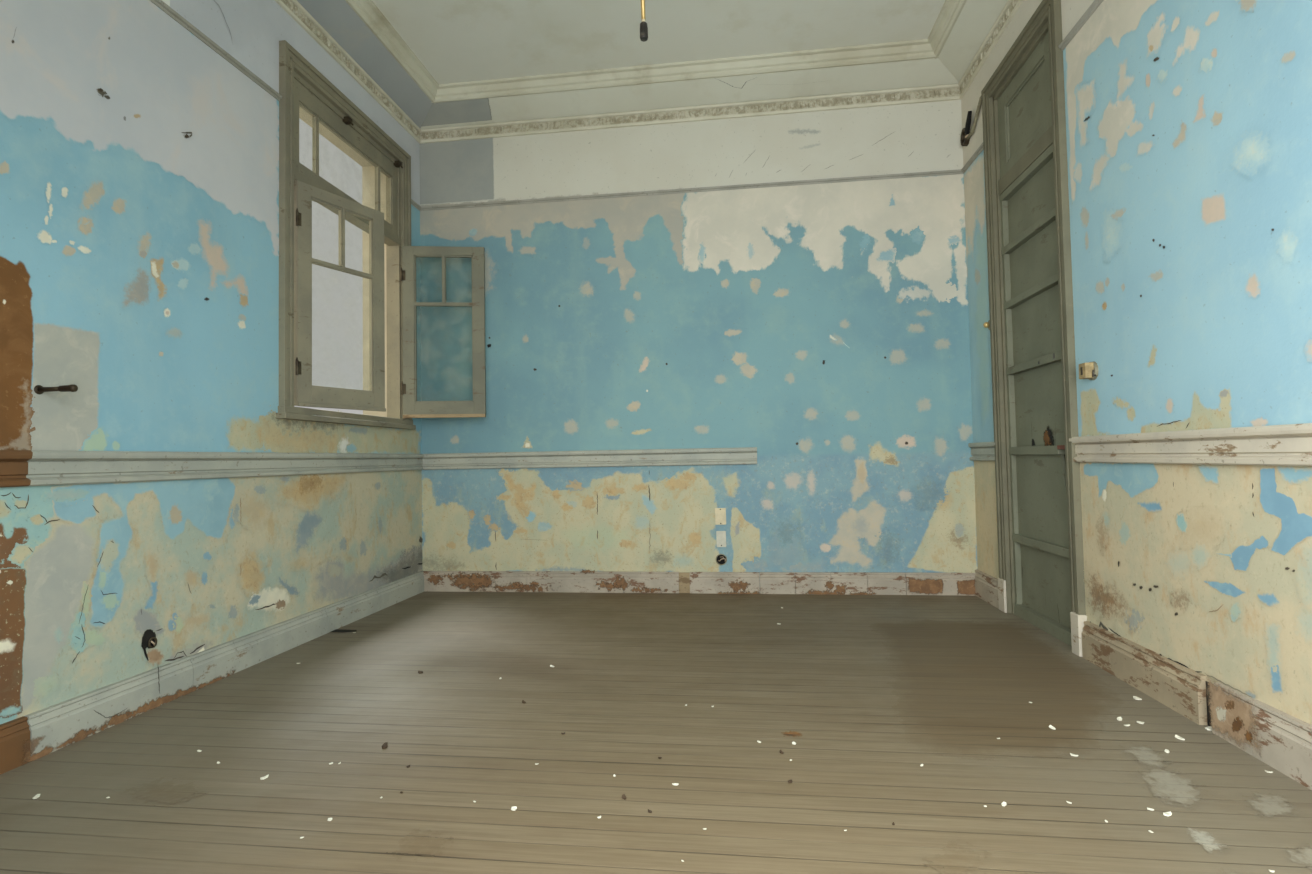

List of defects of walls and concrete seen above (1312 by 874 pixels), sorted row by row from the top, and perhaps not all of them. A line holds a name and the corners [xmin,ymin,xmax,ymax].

peeling [0,0,279,257]
peeling [1065,0,1227,251]
peeling [121,218,249,357]
peeling [420,151,992,595]
peeling [1079,387,1233,437]
peeling [1244,272,1261,299]
peeling [0,478,240,766]
peeling [209,465,762,620]
peeling [1083,463,1312,694]
spalling [1207,676,1259,749]